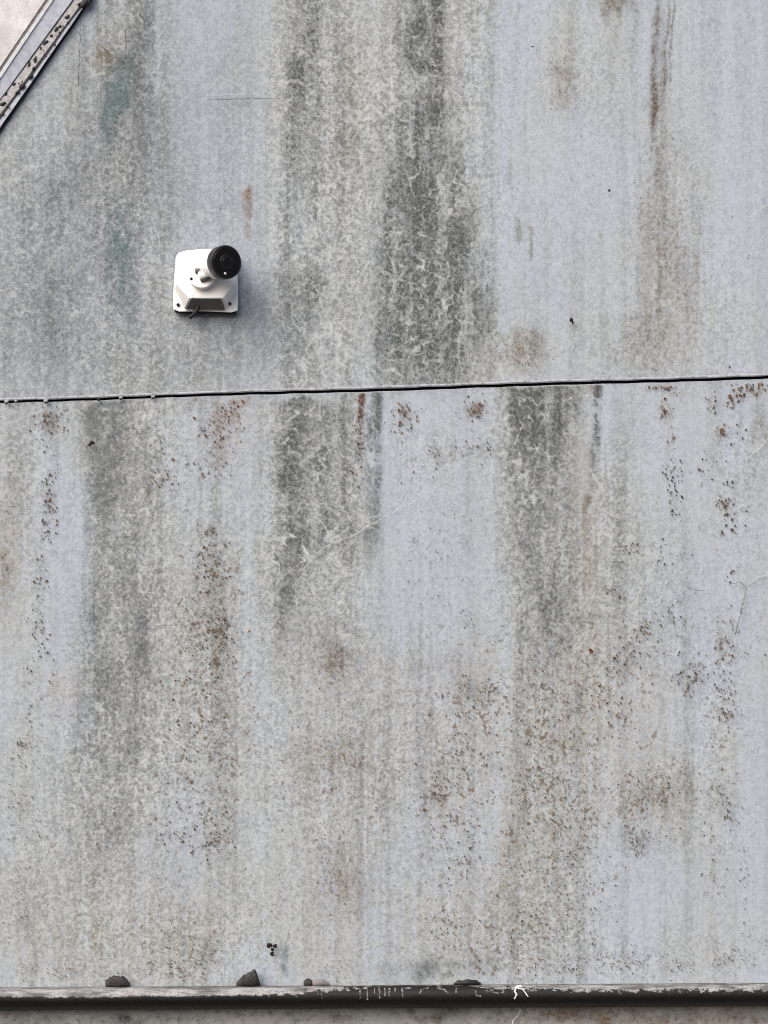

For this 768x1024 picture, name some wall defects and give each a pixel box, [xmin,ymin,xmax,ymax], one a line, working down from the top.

rust [147,400,245,495]
rust [343,393,365,488]
rust [615,386,693,584]
rust [697,382,768,537]
rust [0,406,75,847]
rust [152,523,251,871]
rust [311,593,767,983]